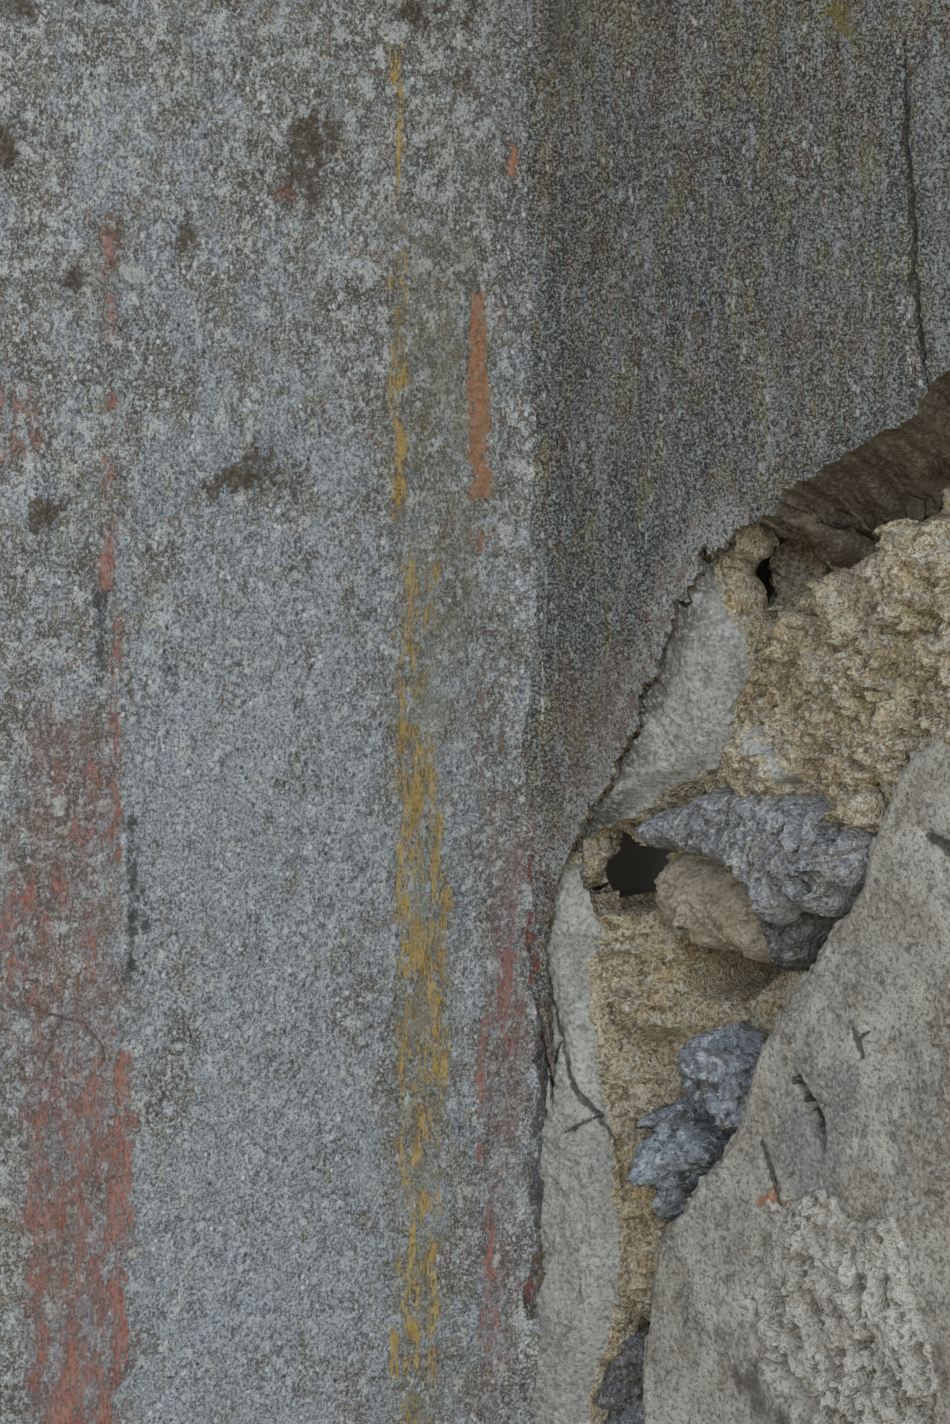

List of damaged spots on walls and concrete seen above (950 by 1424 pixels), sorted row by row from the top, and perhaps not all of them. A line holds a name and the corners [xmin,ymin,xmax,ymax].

leakage [399,0,491,37]
leakage [449,57,487,107]
leakage [388,107,405,199]
crack [901,53,929,384]
flaking render [529,370,950,1424]